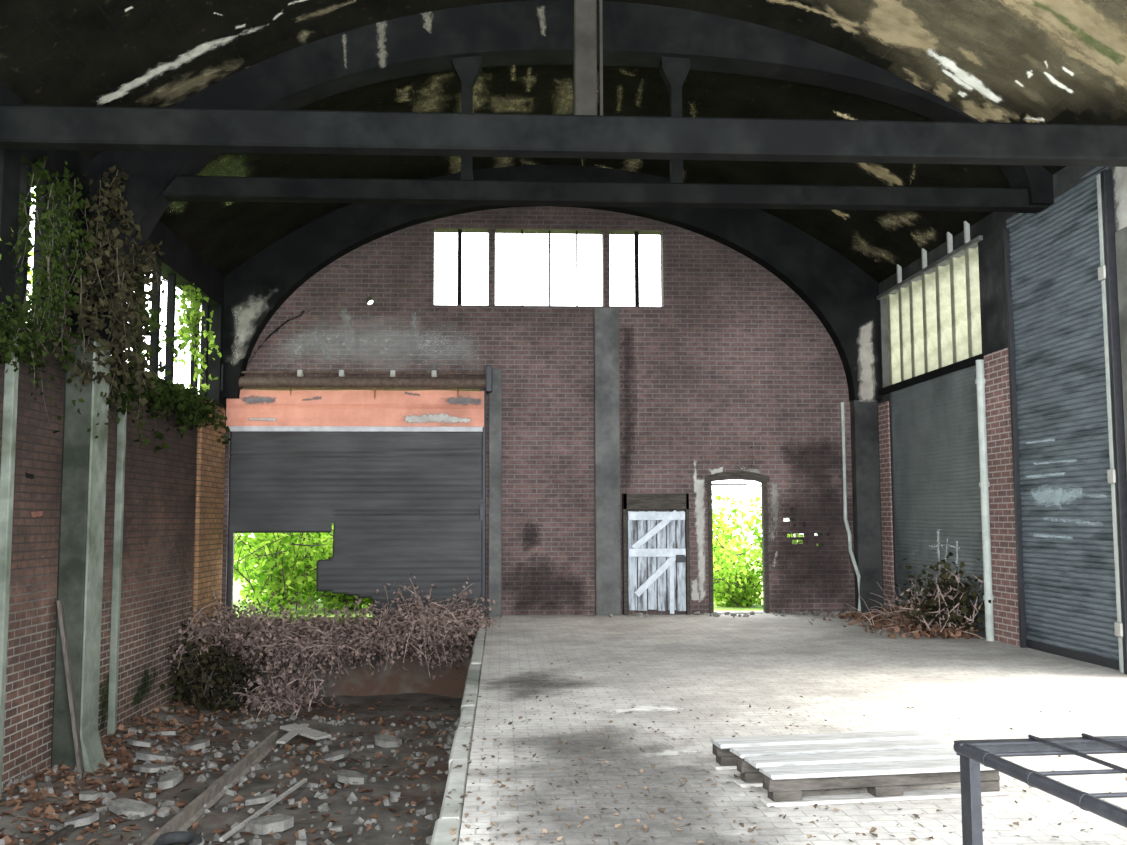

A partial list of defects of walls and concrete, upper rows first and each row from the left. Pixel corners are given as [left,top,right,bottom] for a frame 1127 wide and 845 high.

flaking render [297,0,356,41]
spalling [423,12,433,32]
spalling [538,6,546,35]
spalling [377,22,386,68]
flaking render [768,0,1127,123]
flaking render [149,66,236,106]
flaking render [396,75,446,112]
flaking render [458,65,534,112]
peeling [405,413,470,423]
damp [783,444,843,591]